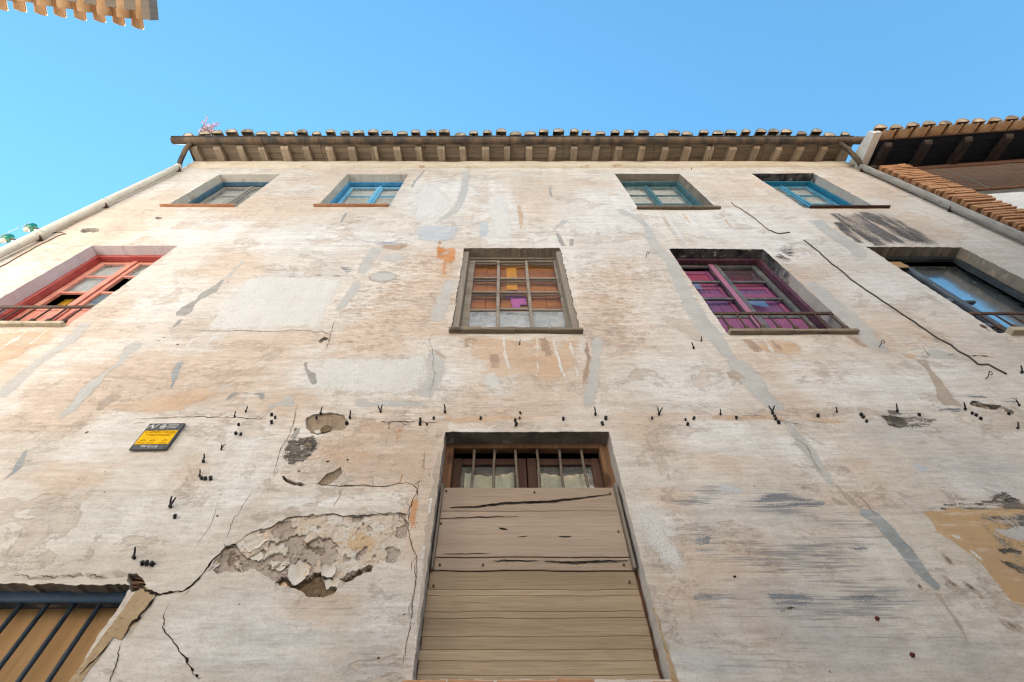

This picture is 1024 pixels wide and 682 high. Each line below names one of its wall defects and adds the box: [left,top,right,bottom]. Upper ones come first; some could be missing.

damp [830,212,911,247]
rust [436,241,456,278]
spalling [306,414,347,435]
damp [881,408,960,428]
spalling [319,459,349,486]
crack [140,453,430,679]
spalling [211,513,408,597]
peeling [924,492,1024,607]